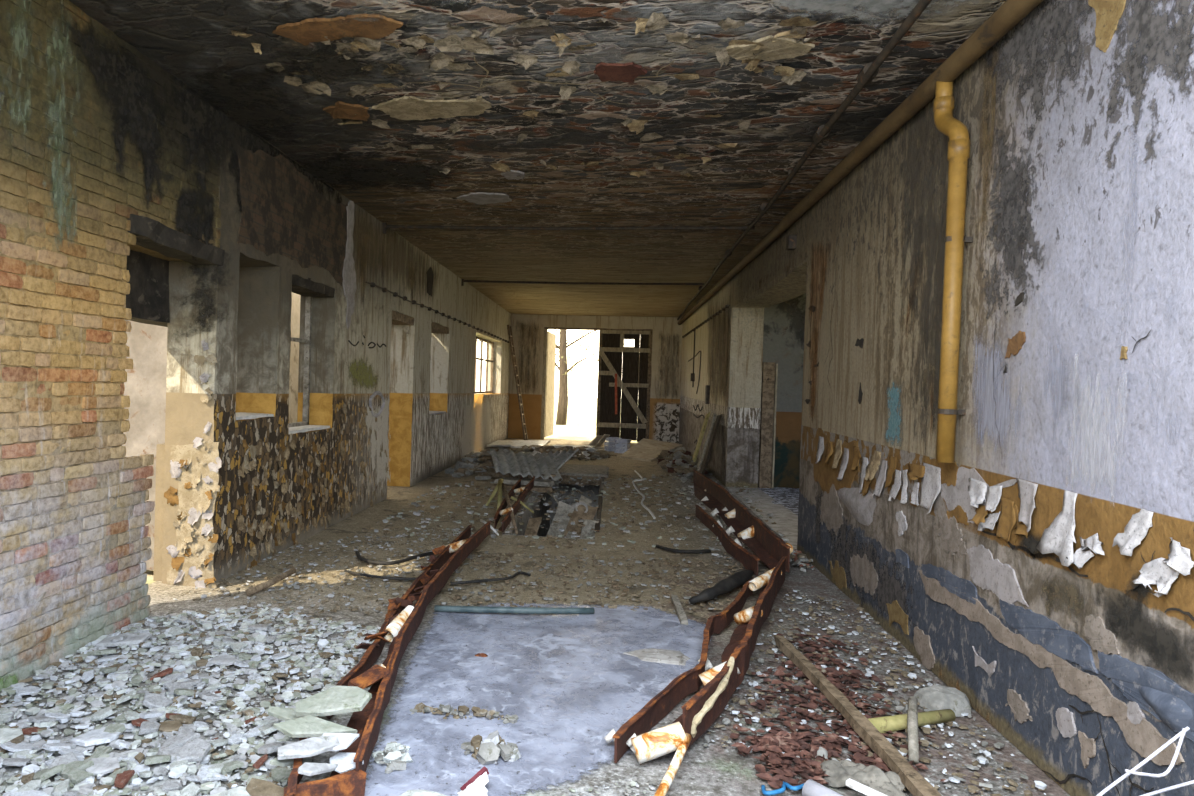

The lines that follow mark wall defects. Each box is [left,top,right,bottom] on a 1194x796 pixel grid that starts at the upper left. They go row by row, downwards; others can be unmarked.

peeling [230,13,597,134]
flaking render [594,62,719,95]
peeling [604,117,751,184]
peeling [635,12,818,85]
water stain [970,0,1092,319]
flaking render [1088,0,1126,53]
water stain [1099,0,1194,190]
water stain [901,100,949,449]
flaking render [164,422,222,588]
peeling [235,391,391,570]
peeling [813,428,1194,768]
water stain [1041,574,1194,690]